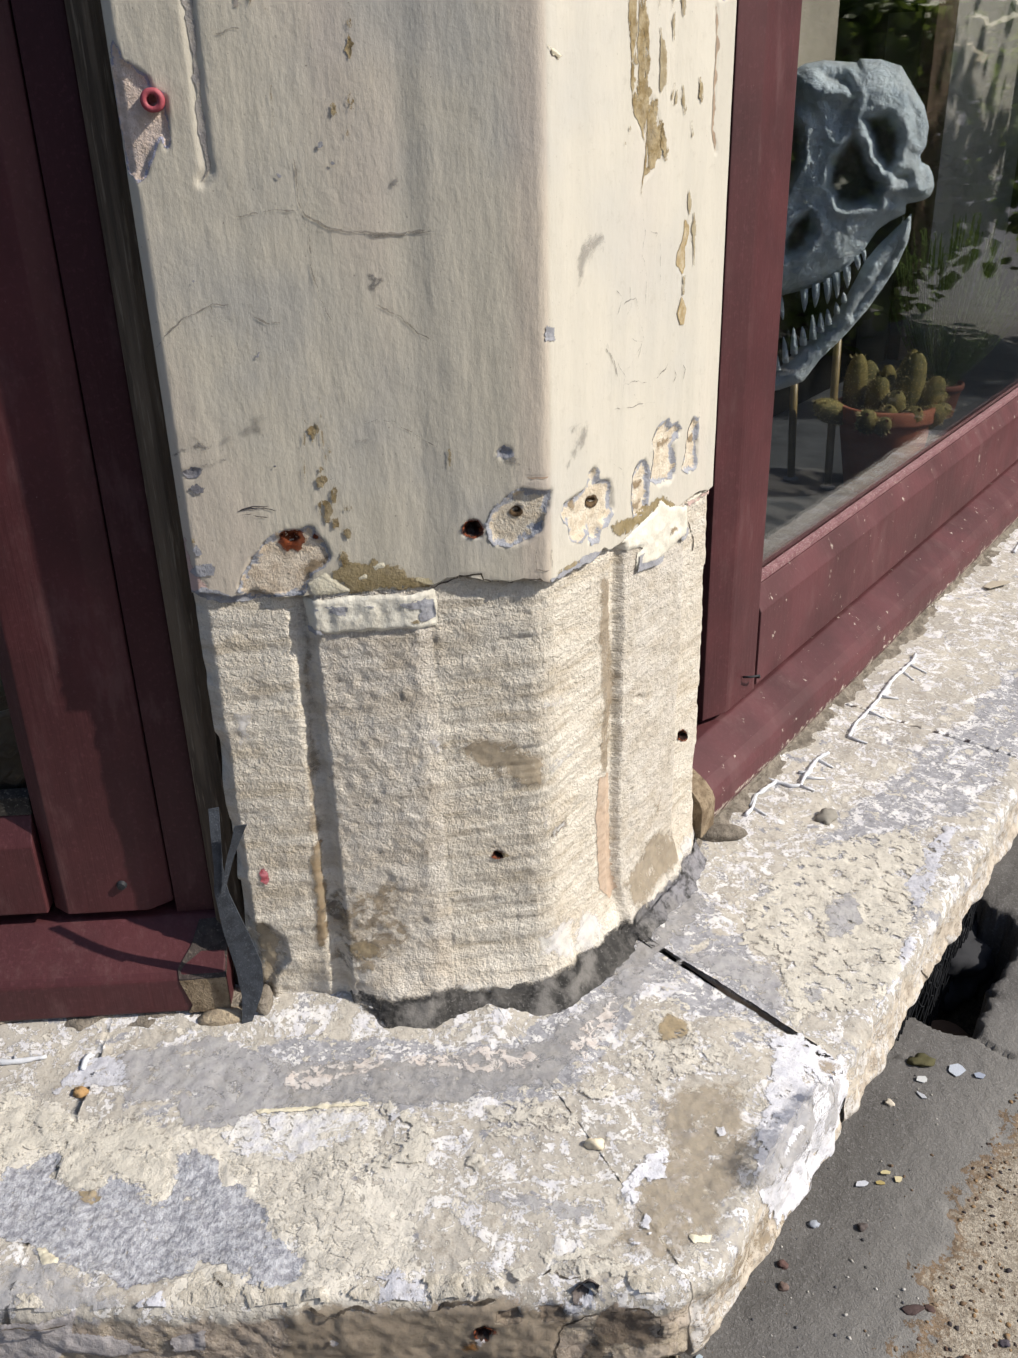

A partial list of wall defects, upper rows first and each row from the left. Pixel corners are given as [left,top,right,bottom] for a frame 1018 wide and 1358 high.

spalling [110,41,171,183]
peeling [625,0,704,194]
crack [239,137,430,319]
corrosion [278,530,307,552]
flaking render [182,399,707,1007]
spalling [815,808,838,826]
peeling [404,1046,539,1073]
peeling [738,825,961,1229]
peeling [0,1053,670,1358]
peeling [689,1234,712,1243]